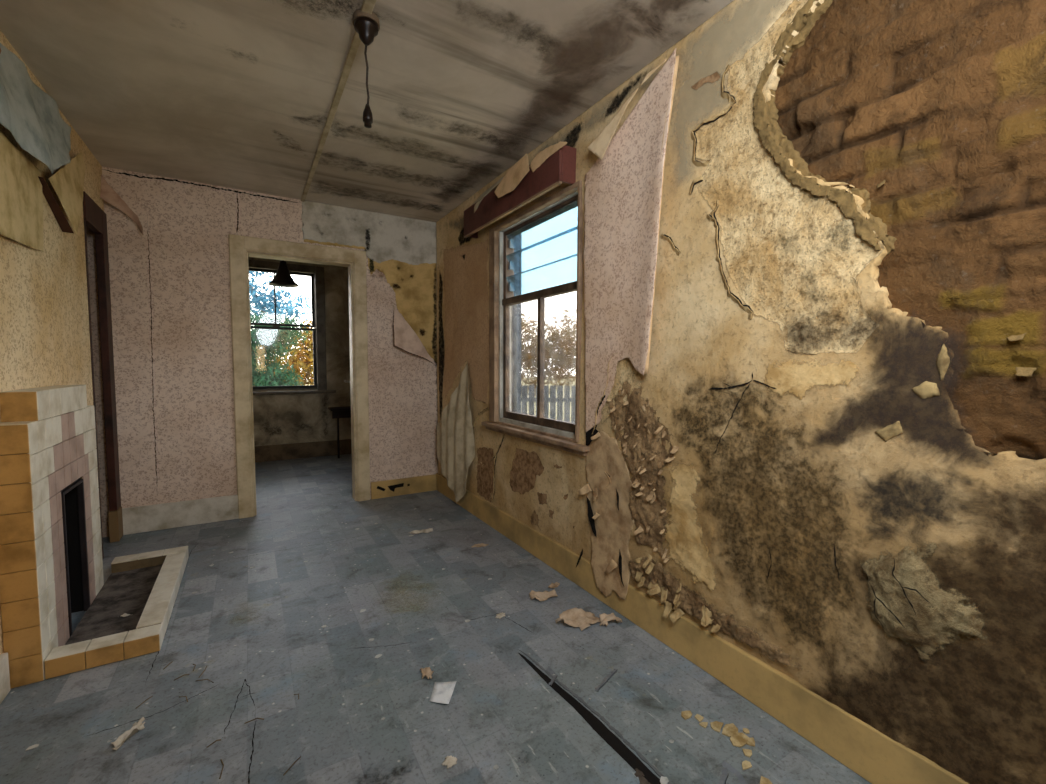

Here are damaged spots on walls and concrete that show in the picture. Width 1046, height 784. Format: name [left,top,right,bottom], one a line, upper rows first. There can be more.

water stain [480,19,637,150]
water stain [605,73,646,116]
flaking render [301,200,437,360]
crack [689,176,754,319]
flaking render [691,0,1046,460]
water stain [790,312,989,463]
flaking render [586,358,801,669]
water stain [674,380,1046,784]
crack [248,713,256,784]